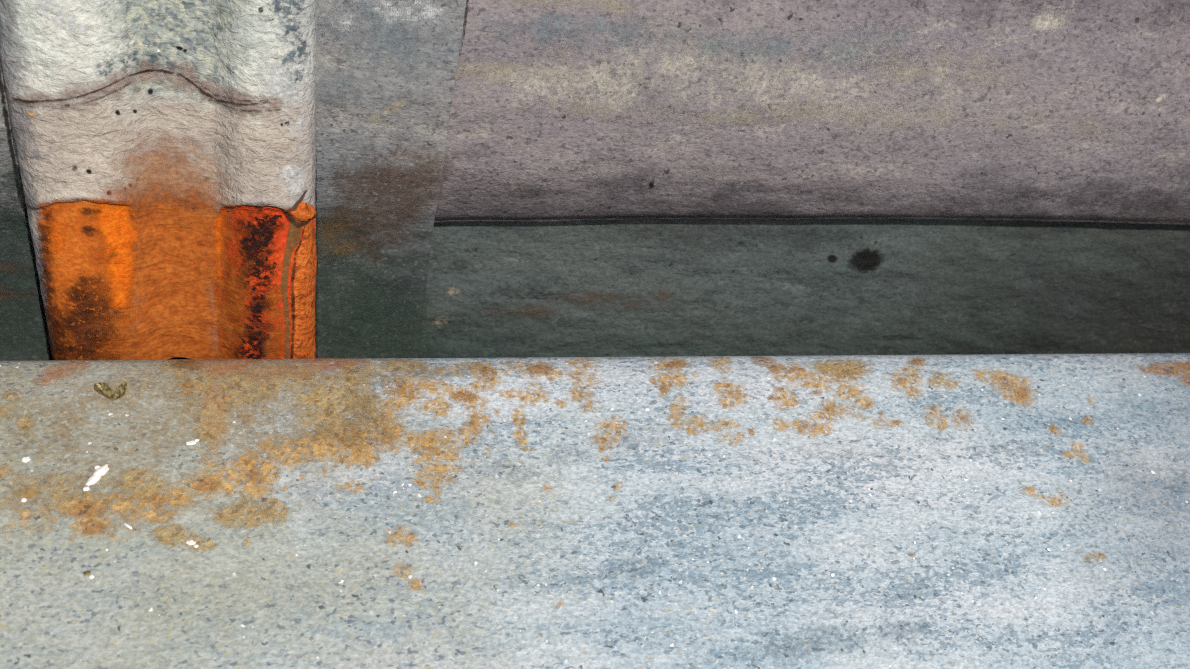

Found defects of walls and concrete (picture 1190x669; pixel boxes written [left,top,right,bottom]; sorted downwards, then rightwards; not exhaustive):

corrosion [13,148,593,551]
corrosion [596,418,626,461]
corrosion [651,358,754,443]
corrosion [754,357,900,435]
corrosion [894,358,957,396]
corrosion [927,407,966,430]
corrosion [977,371,1032,404]
corrosion [1140,362,1190,384]